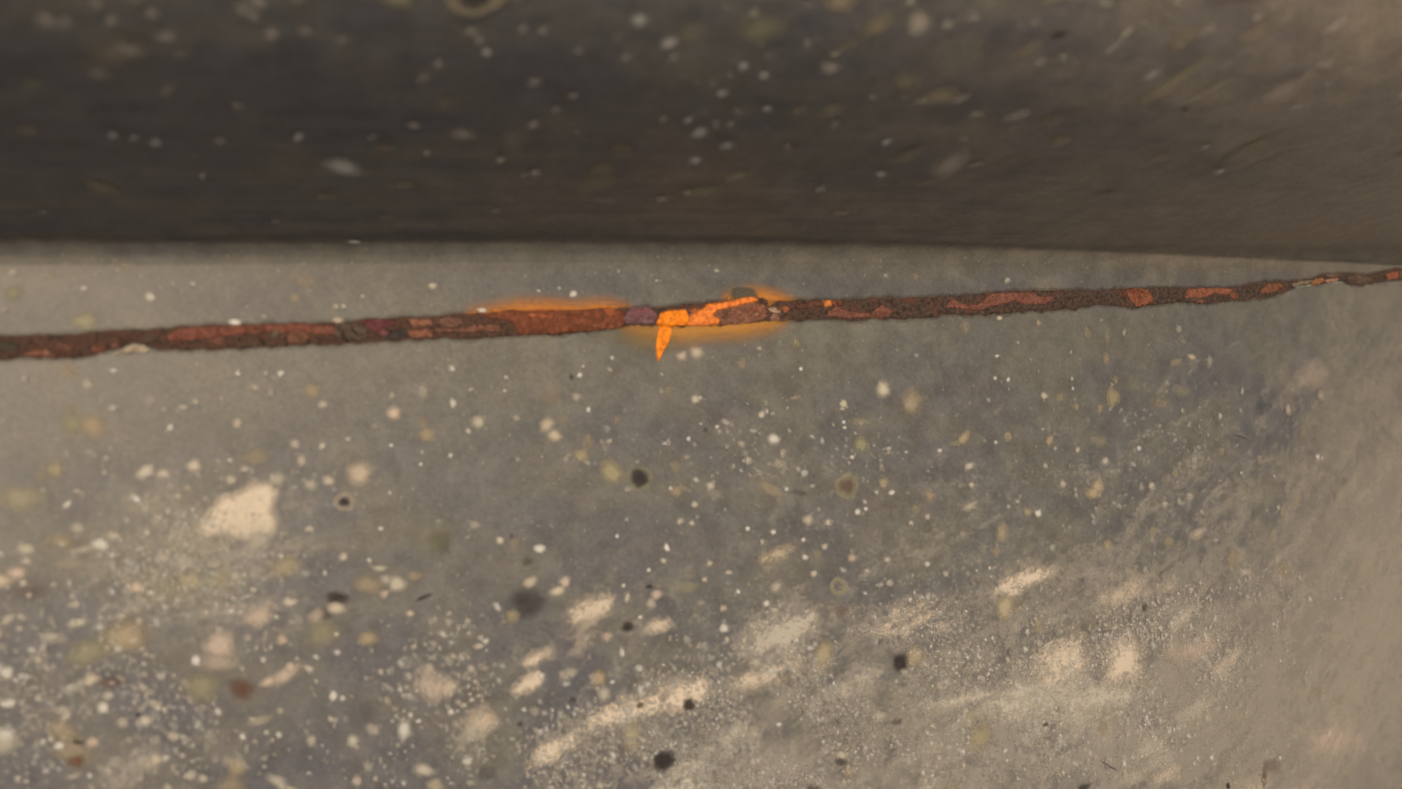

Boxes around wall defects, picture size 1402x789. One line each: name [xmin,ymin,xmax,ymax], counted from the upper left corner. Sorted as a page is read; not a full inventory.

rust [1260,271,1402,294]
rust [946,292,1055,310]
rust [1118,288,1153,307]
rust [1186,288,1238,304]
rust [138,290,893,361]